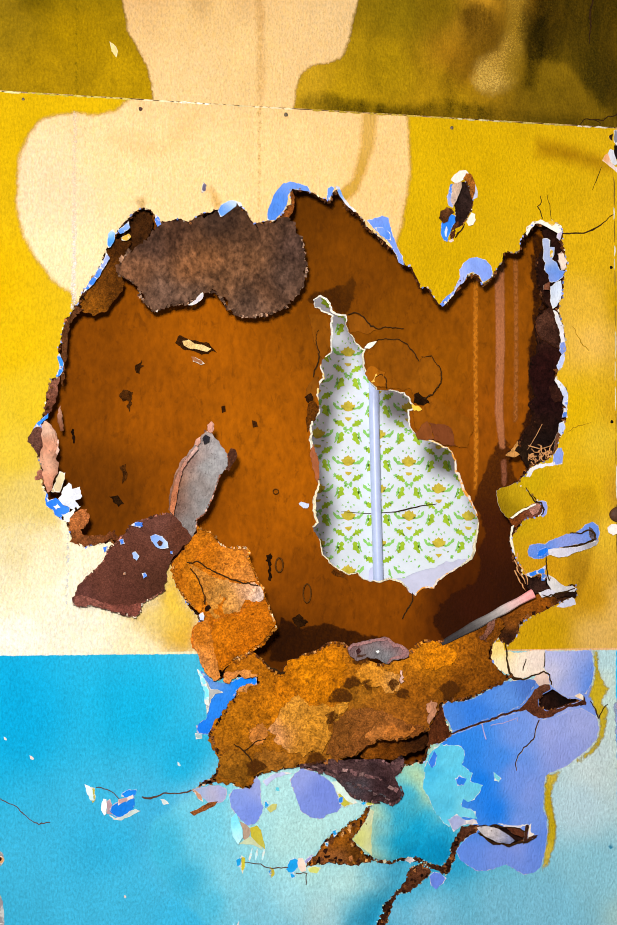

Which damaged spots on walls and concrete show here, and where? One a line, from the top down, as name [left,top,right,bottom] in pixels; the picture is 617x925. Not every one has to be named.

spalling [0,91,293,110]
spalling [313,109,563,126]
spalling [439,170,478,242]
spalling [577,125,617,426]
peeling [27,181,617,885]
crack [369,824,479,925]